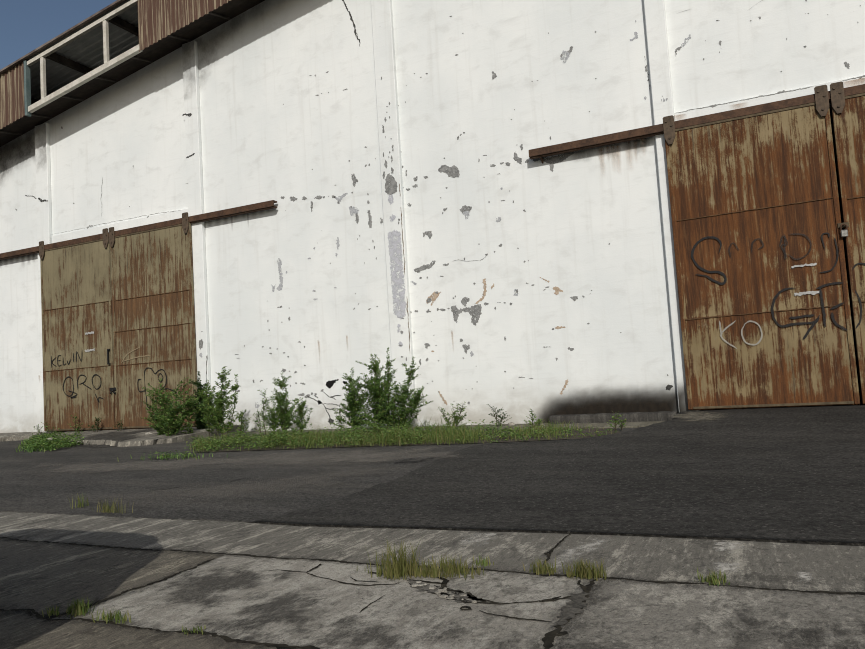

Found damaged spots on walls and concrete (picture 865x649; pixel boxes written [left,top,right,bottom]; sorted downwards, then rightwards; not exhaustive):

crack [342,0,360,46]
peeling [478,144,576,174]
peeling [281,101,549,365]
crack [0,533,865,649]